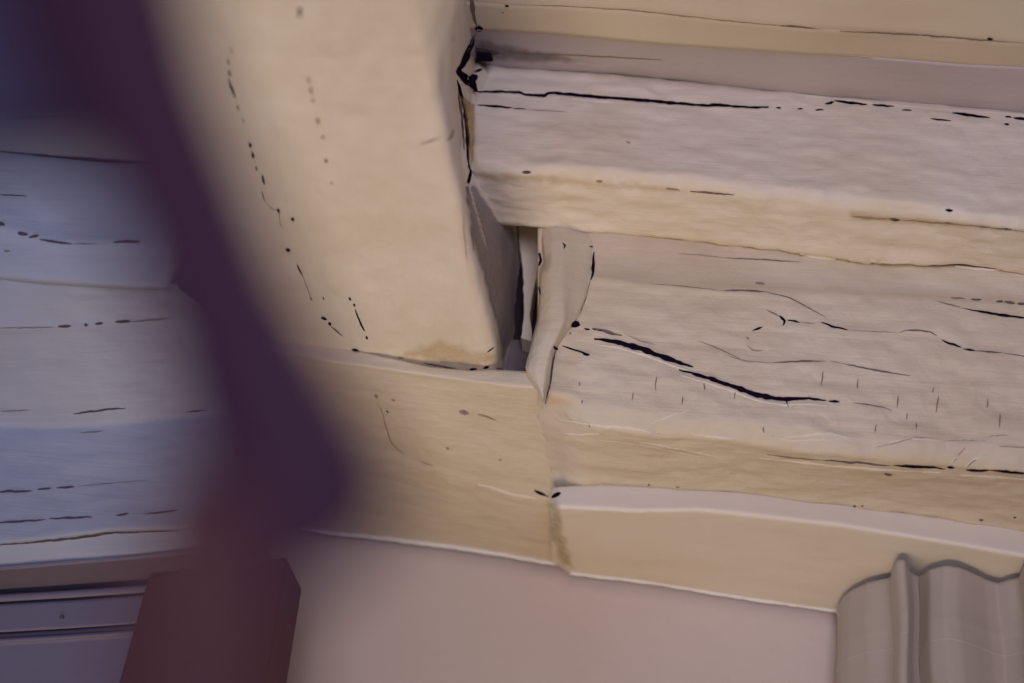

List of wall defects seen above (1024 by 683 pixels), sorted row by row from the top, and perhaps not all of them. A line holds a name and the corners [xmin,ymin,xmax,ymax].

crack [228,48,368,352]
crack [422,80,1024,258]
crack [398,348,503,370]
crack [547,246,910,411]
crack [650,254,1024,357]
crack [760,435,1024,480]